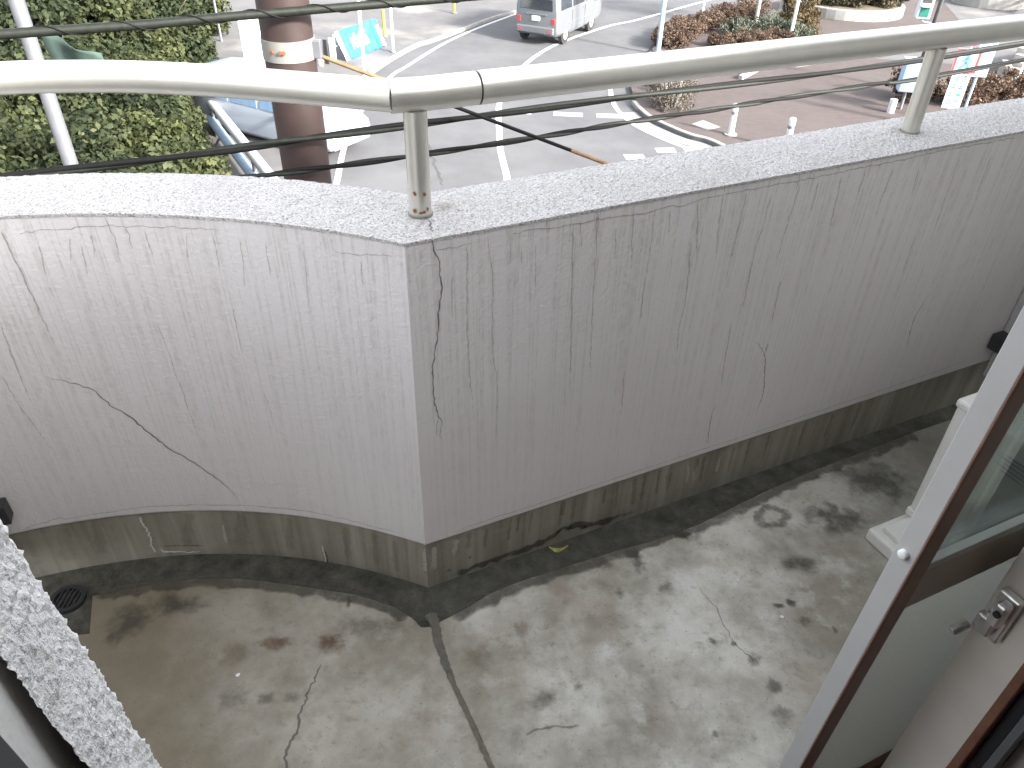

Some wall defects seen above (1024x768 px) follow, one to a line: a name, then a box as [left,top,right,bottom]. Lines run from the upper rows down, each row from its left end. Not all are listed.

crack [425,218,443,421]
crack [55,379,235,496]
water stain [139,517,201,553]
water stain [455,433,918,620]
water stain [101,573,406,621]
crack [283,665,321,768]
crack [425,612,494,768]